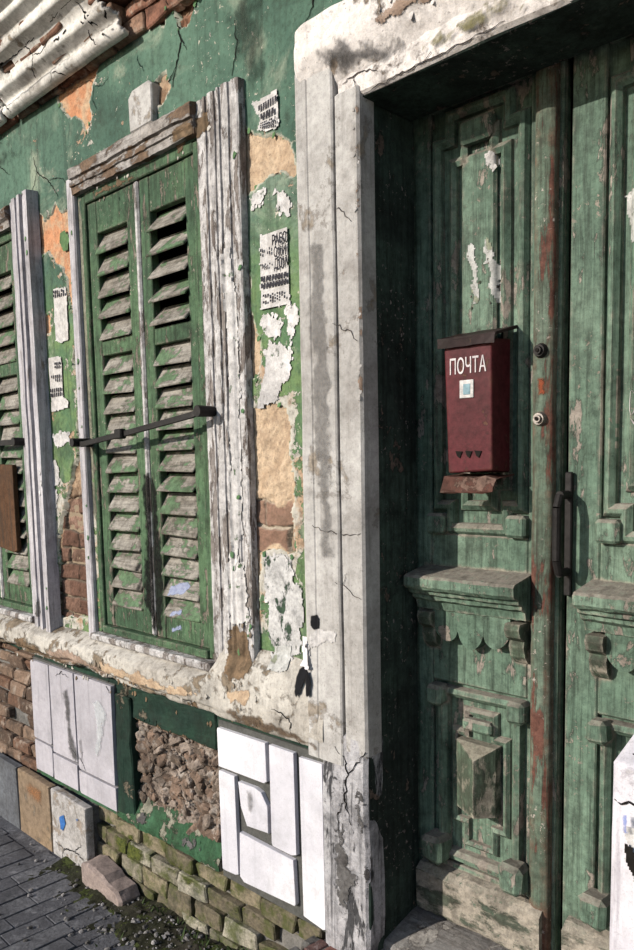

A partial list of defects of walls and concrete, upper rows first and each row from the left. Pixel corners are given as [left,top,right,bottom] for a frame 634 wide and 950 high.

crack [0,0,107,78]
crack [166,2,187,96]
spalling [371,0,435,26]
spalling [58,69,98,134]
crack [21,157,66,197]
spalling [233,127,296,217]
peeling [39,205,73,309]
spalling [39,426,89,618]
spalling [220,246,336,710]
crack [335,747,366,847]
spalling [624,844,634,876]